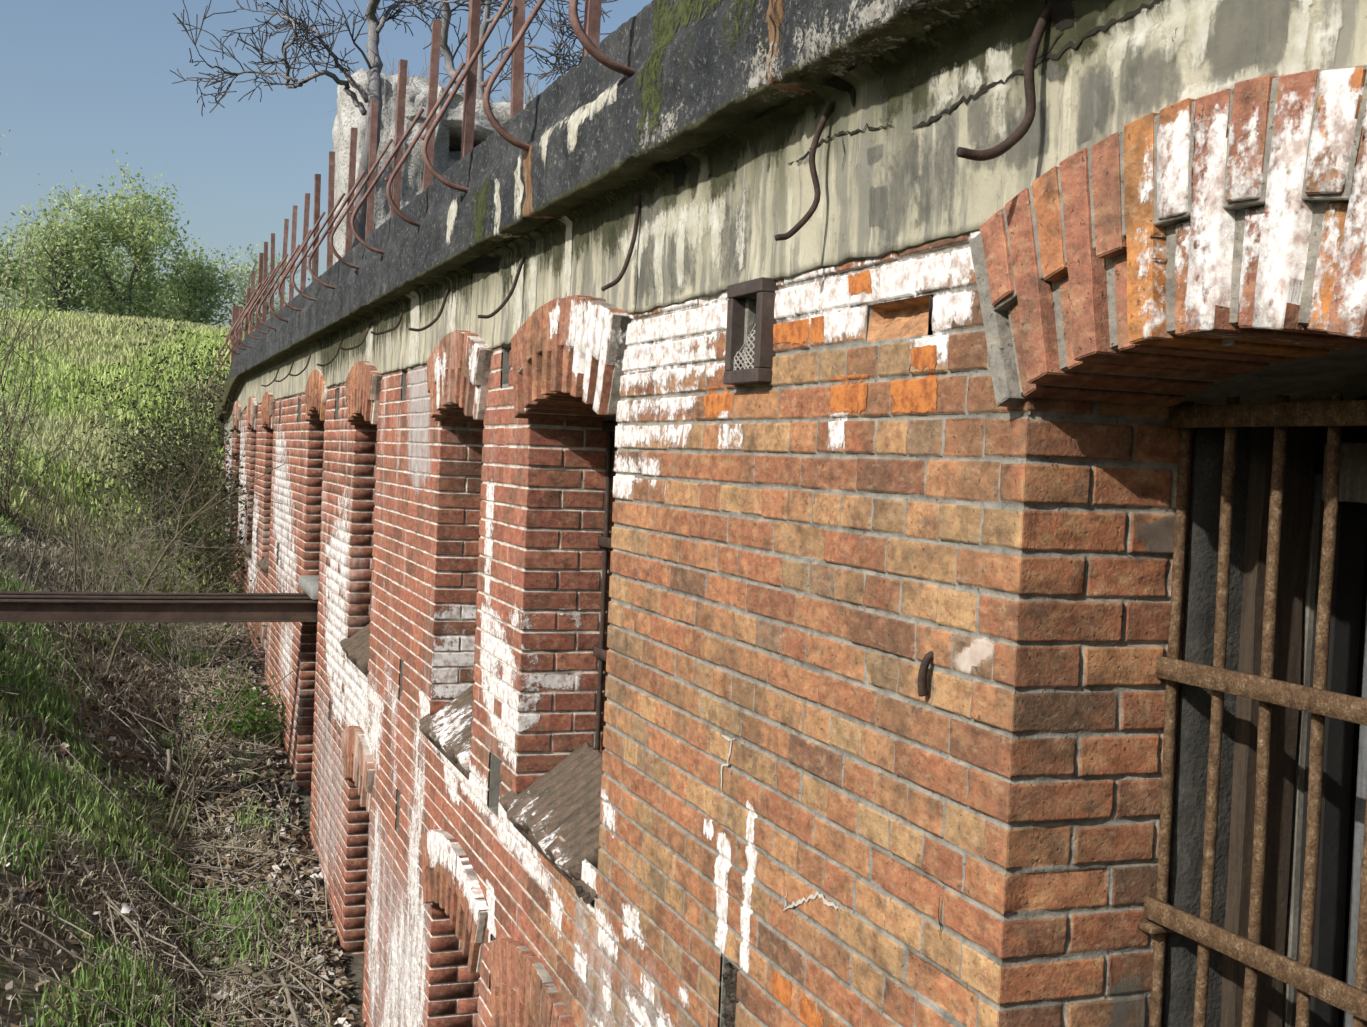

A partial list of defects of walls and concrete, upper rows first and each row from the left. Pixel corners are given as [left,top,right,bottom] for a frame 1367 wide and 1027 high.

corrosion [766,0,815,95]
crack [788,0,1178,166]
water stain [446,198,457,242]
water stain [494,84,825,336]